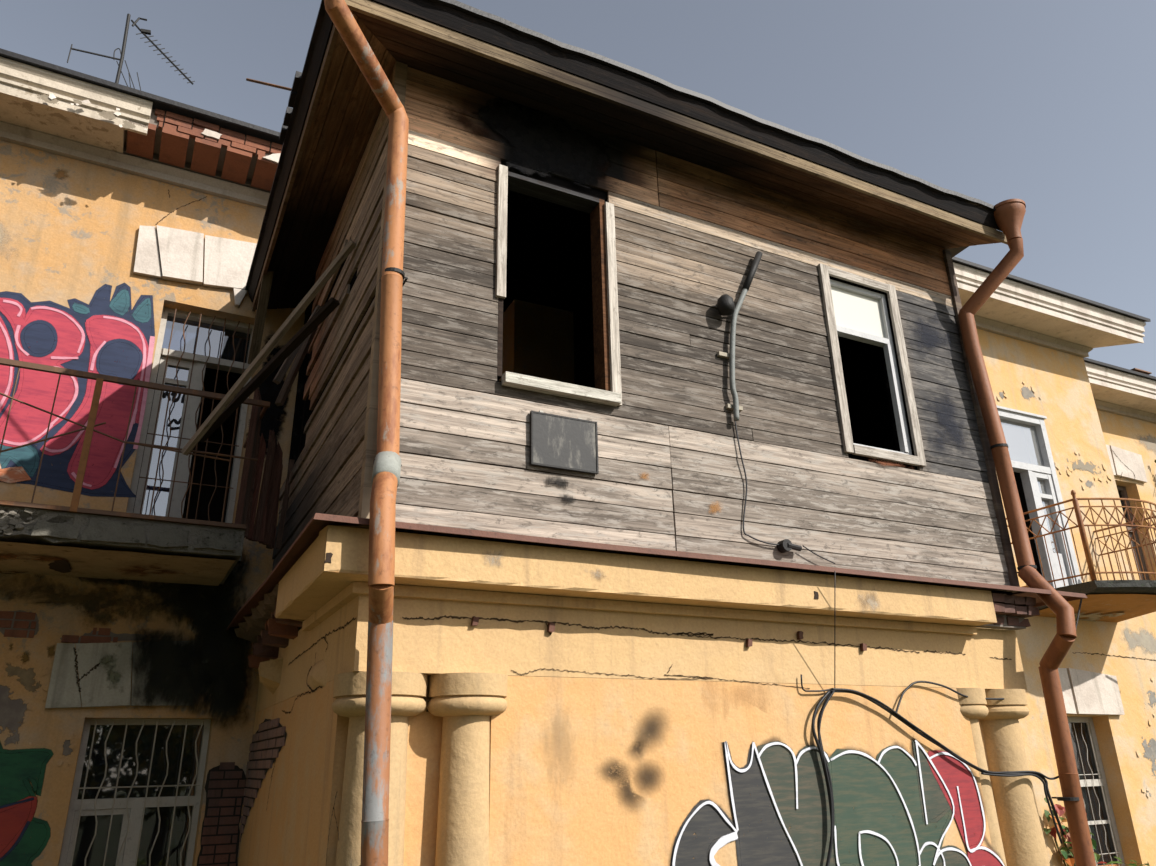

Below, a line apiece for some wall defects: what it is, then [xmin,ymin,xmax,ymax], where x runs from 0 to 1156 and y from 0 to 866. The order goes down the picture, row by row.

peeling [1055,451,1112,490]
spalling [0,610,39,638]
water stain [0,557,251,727]
crack [288,617,356,666]
crack [402,615,1012,660]
peeling [1124,629,1156,654]
peeling [0,653,50,746]
crack [73,648,100,692]
crack [511,666,810,689]
water stain [633,719,659,753]
peeling [1136,677,1156,798]
water stain [607,765,656,801]